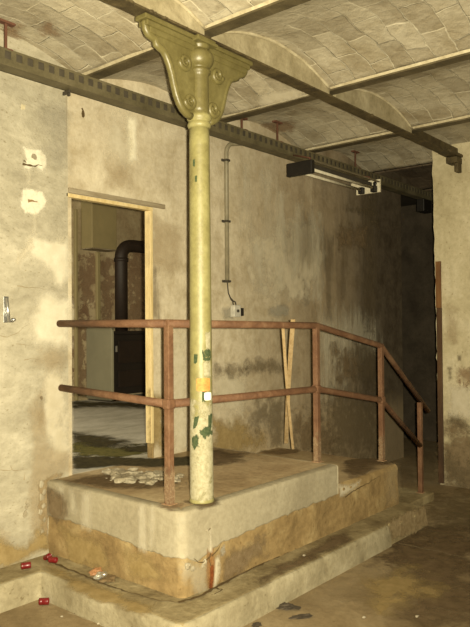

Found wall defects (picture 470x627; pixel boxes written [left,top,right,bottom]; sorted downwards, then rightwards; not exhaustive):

peeling [173,332,245,501]
corrosion [207,541,215,589]